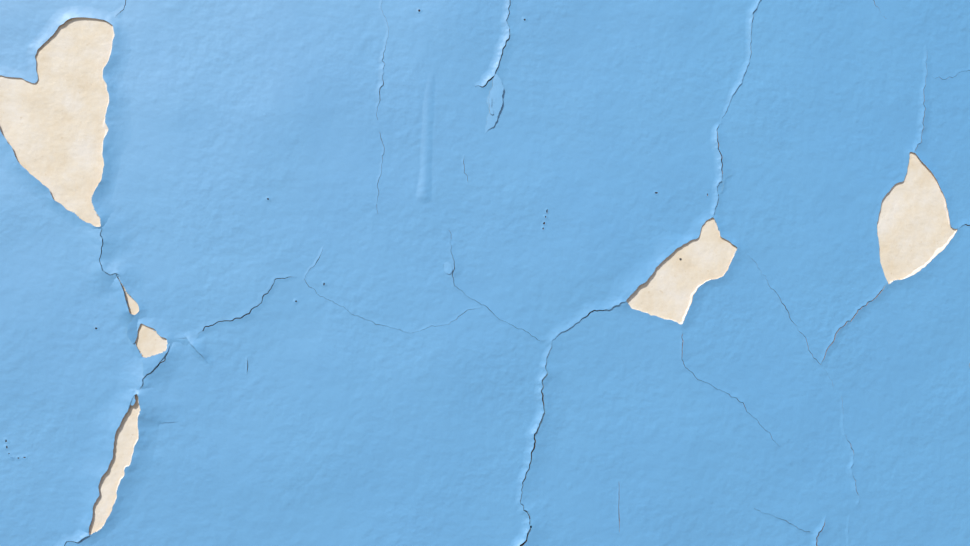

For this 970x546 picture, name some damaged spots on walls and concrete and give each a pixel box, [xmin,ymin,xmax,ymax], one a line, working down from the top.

peeling [0,6,133,239]
crack [474,0,521,134]
crack [709,0,760,230]
crack [911,44,933,163]
crack [73,195,146,309]
peeling [61,266,185,545]
crack [116,232,634,546]
peeling [604,207,752,334]
crack [820,282,891,366]
peeling [871,144,965,292]
crack [52,521,103,546]
crack [760,511,833,546]